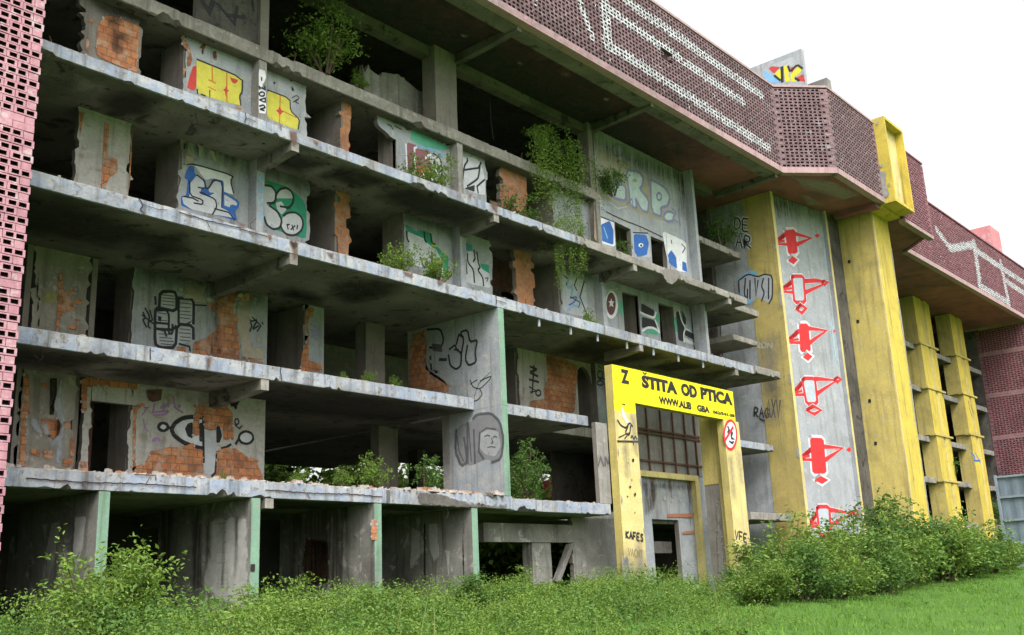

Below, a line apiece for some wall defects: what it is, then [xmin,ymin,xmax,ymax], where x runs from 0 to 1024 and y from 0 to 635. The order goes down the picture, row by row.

flaking render [86,15,140,72]
flaking render [101,122,132,188]
spalling [14,350,88,468]
flaking render [54,271,82,332]
flaking render [177,283,267,365]
spalling [79,367,448,480]
peeling [300,307,323,372]
flaking render [408,329,451,392]
flaking render [529,355,578,414]
spalling [274,501,350,509]
spalling [370,490,506,540]